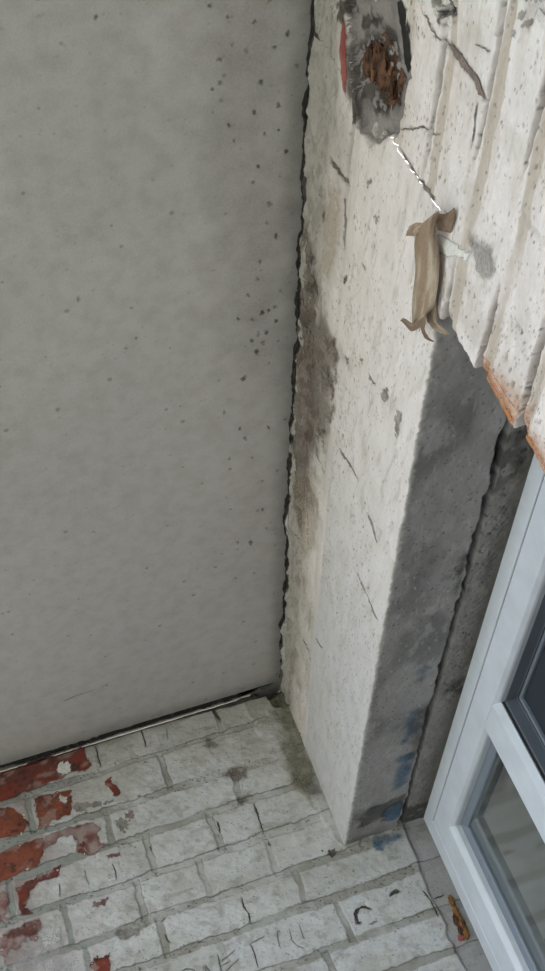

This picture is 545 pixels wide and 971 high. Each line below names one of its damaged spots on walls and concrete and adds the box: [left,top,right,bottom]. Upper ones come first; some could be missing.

spalling [337,0,412,144]
spalling [431,0,457,24]
water stain [293,230,338,523]
peeling [0,747,121,964]
peeling [90,953,111,971]
peeling [116,922,148,940]